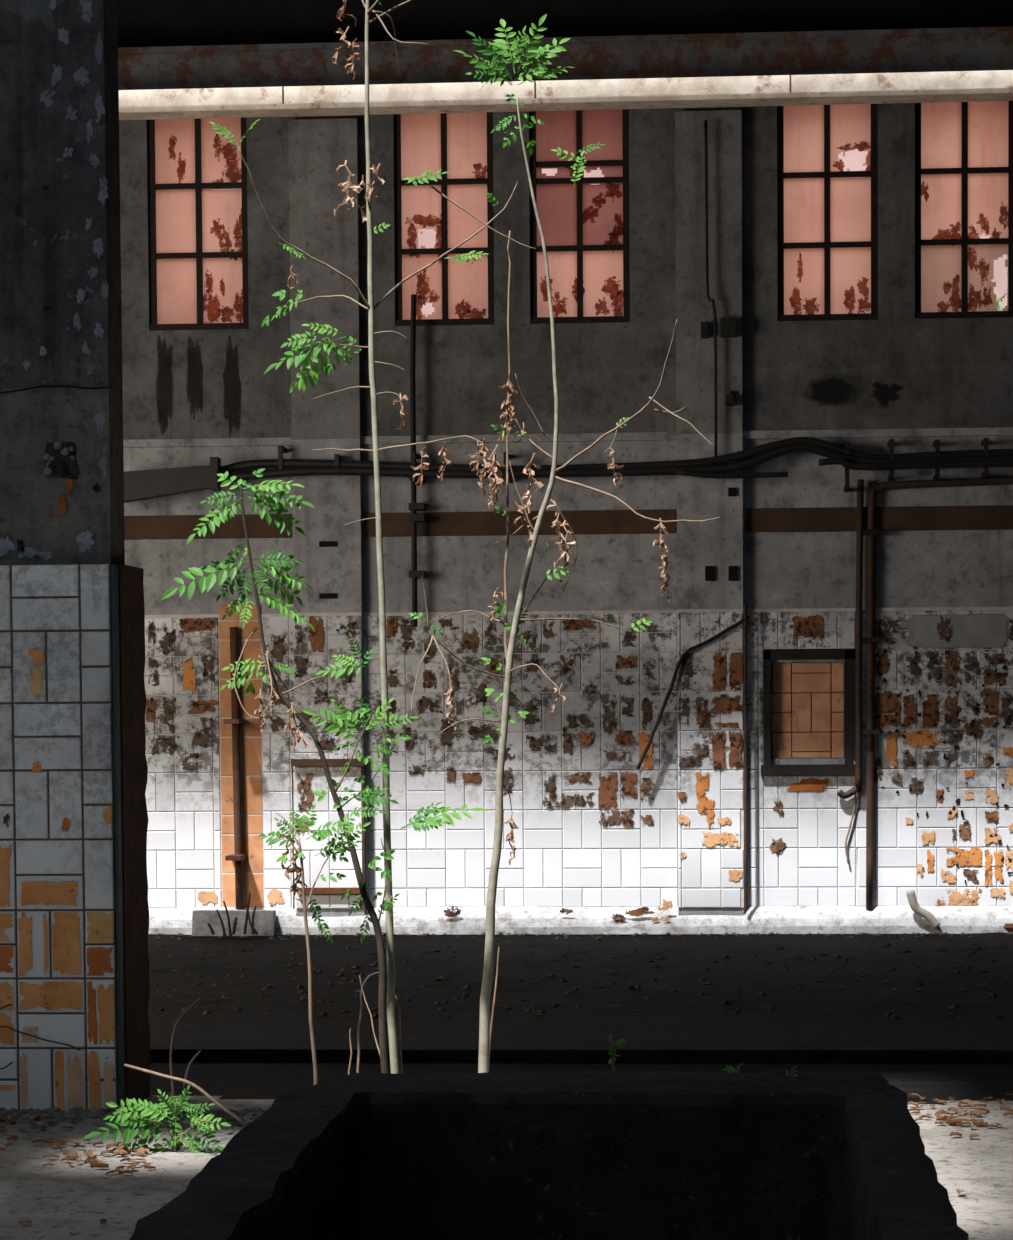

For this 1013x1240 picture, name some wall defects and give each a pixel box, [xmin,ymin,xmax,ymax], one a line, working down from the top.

peeling [677,652,743,847]
peeling [874,614,1013,906]
peeling [0,844,114,1110]